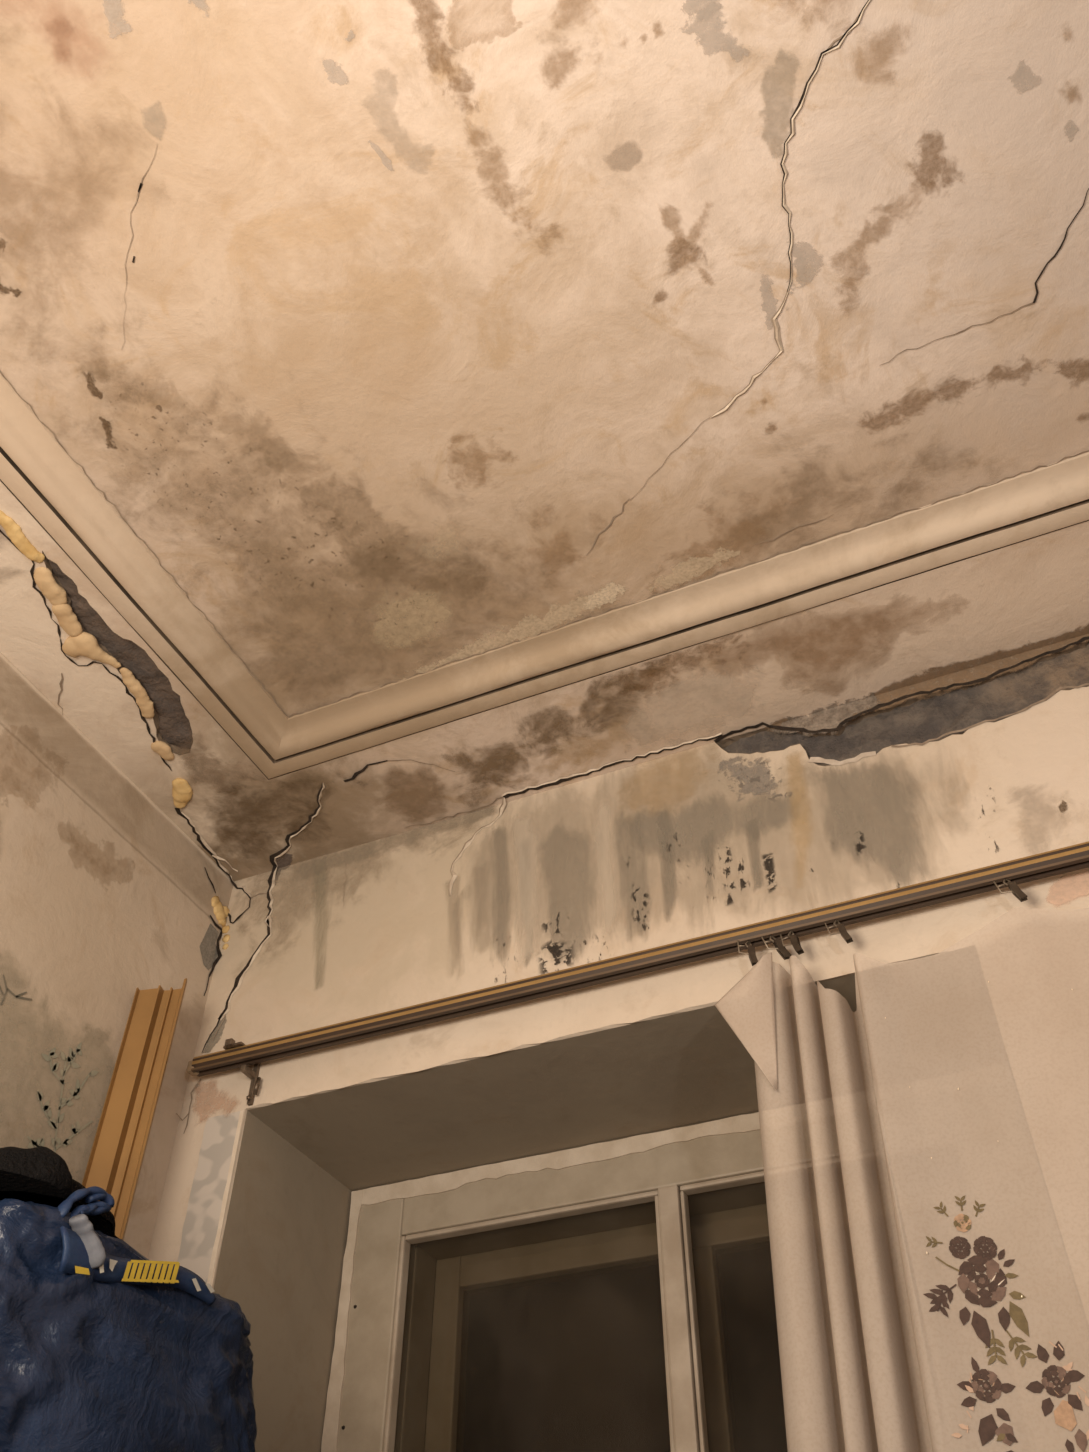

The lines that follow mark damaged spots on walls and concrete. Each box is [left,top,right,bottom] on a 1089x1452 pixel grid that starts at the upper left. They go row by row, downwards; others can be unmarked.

peeling [683,0,749,62]
crack [586,0,871,556]
crack [881,188,1089,365]
water stain [87,373,102,399]
crack [0,371,1089,718]
flaking render [42,551,193,755]
water stain [457,664,753,788]
flaking render [714,636,1089,766]
crack [0,510,455,1134]
water stain [495,830,604,974]
crack [404,733,722,896]
water stain [618,756,794,932]